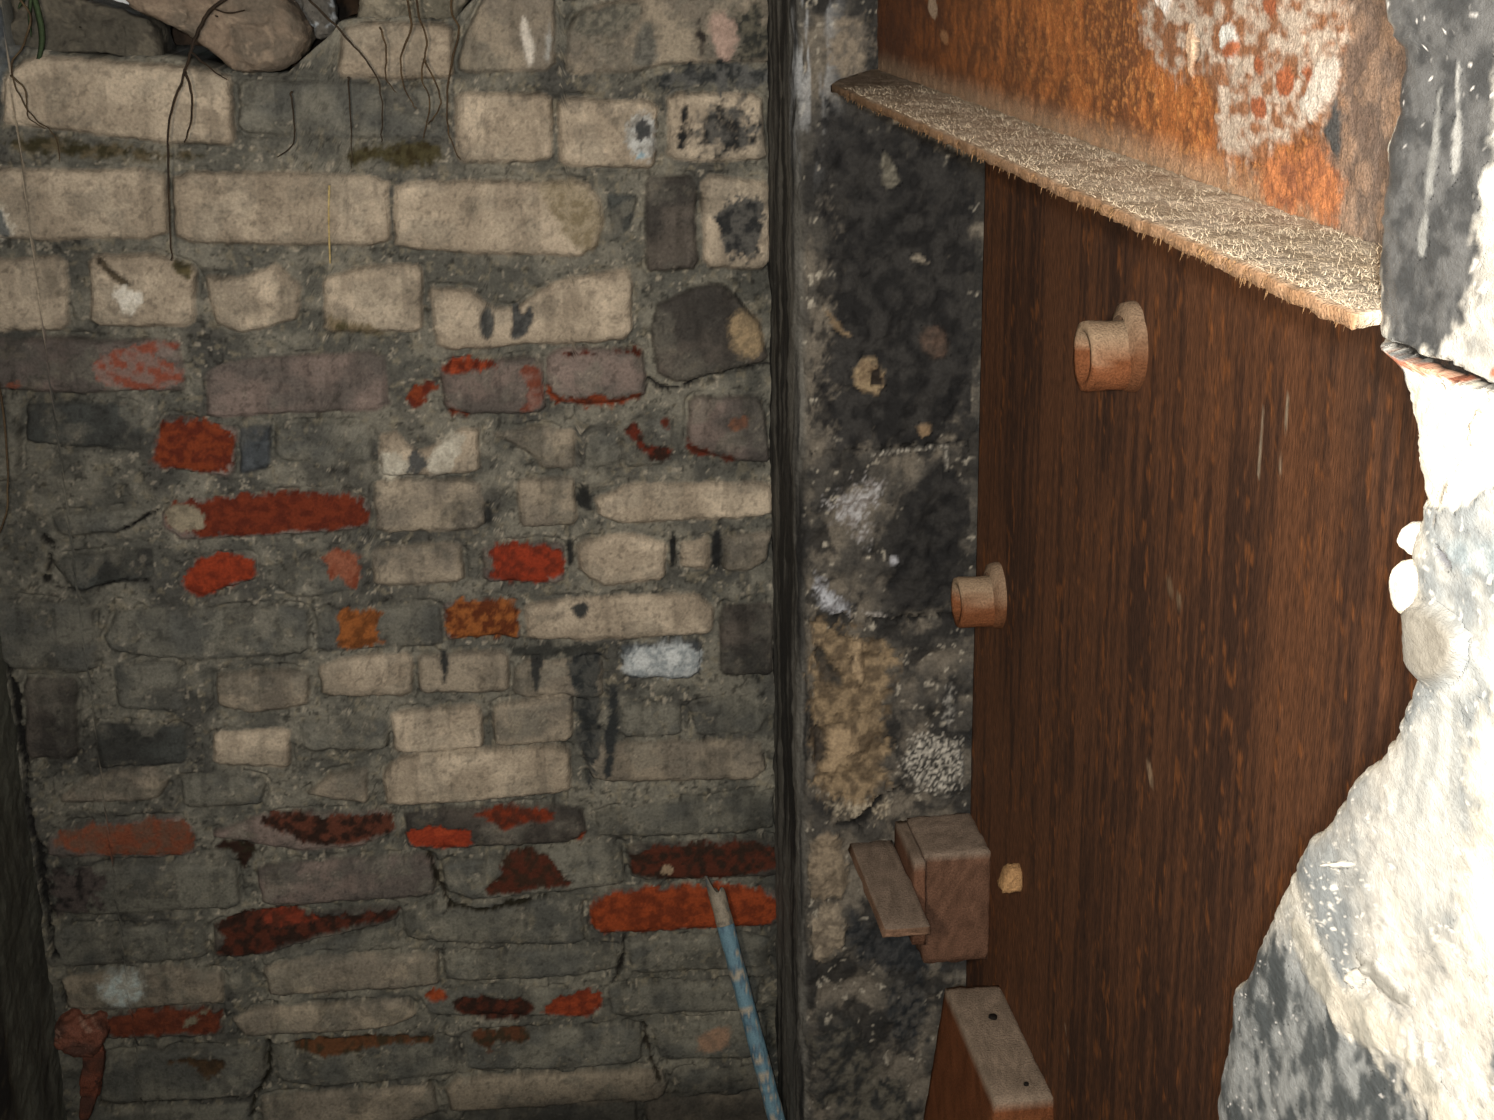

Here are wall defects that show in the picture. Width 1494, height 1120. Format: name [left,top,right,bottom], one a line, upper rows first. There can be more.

rust [1252,132,1351,231]
peeling [1403,370,1494,517]
peeling [1432,541,1453,573]